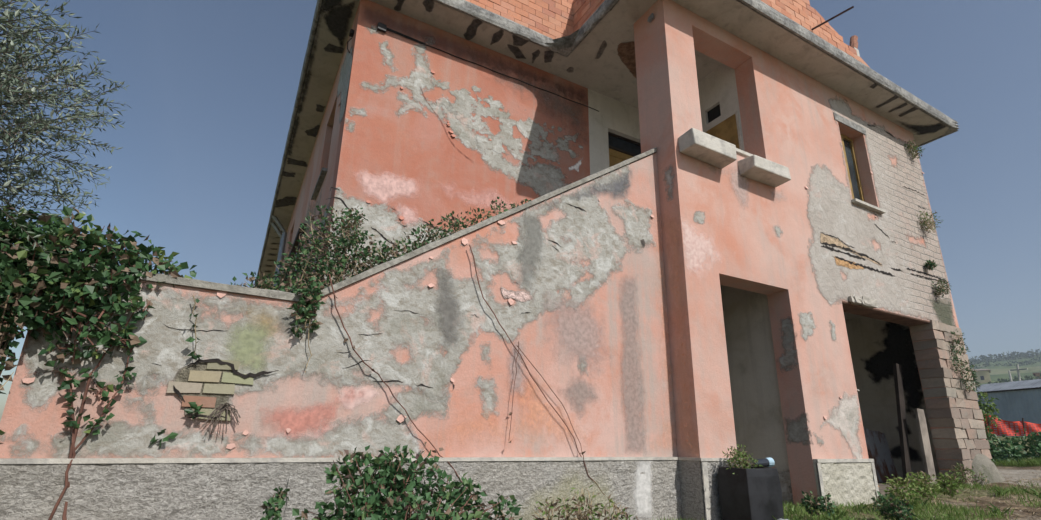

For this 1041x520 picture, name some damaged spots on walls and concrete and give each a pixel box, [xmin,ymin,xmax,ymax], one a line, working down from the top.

spalling [463,19,483,41]
spalling [876,92,919,117]
peeling [1,26,656,458]
flaking render [805,98,956,360]
peeling [779,312,816,371]
crack [152,358,279,418]
peeling [785,413,824,446]
peeling [823,393,863,459]